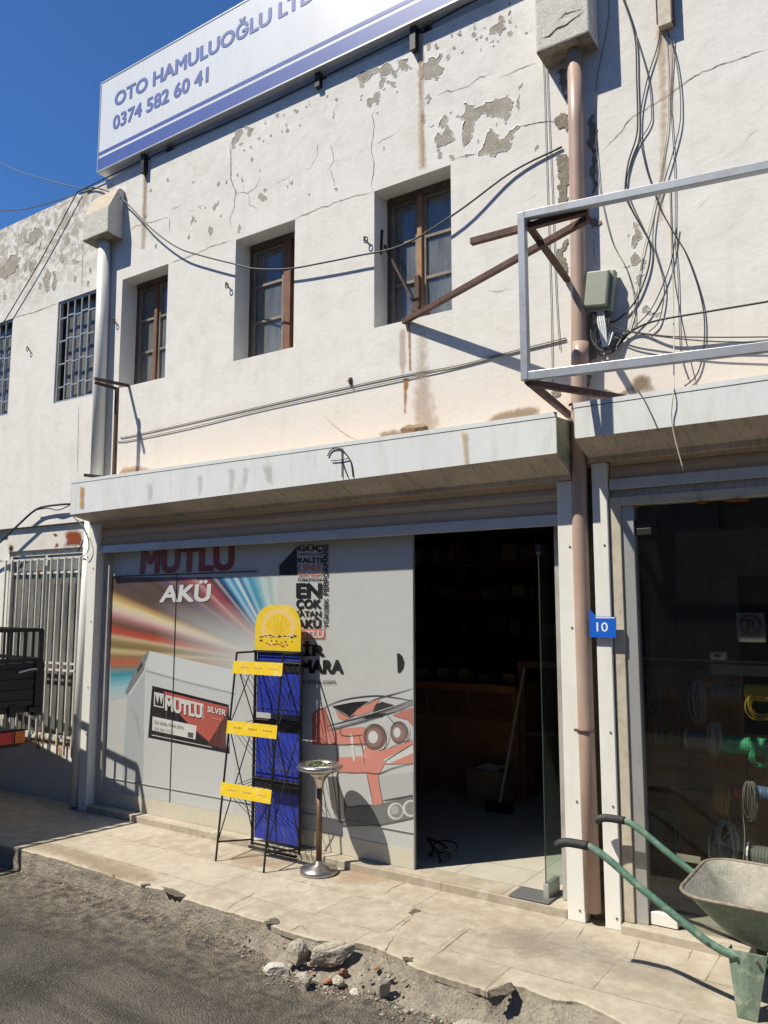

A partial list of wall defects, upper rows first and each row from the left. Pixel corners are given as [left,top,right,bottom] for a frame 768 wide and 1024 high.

peeling [357,2,528,114]
spalling [557,68,567,99]
peeling [420,82,523,161]
spalling [554,113,568,132]
crack [174,117,392,262]
spalling [556,154,569,203]
peeling [0,219,92,293]
spalling [555,238,569,272]
leakage [620,376,648,394]
leakage [490,408,537,421]
rust [53,531,81,547]